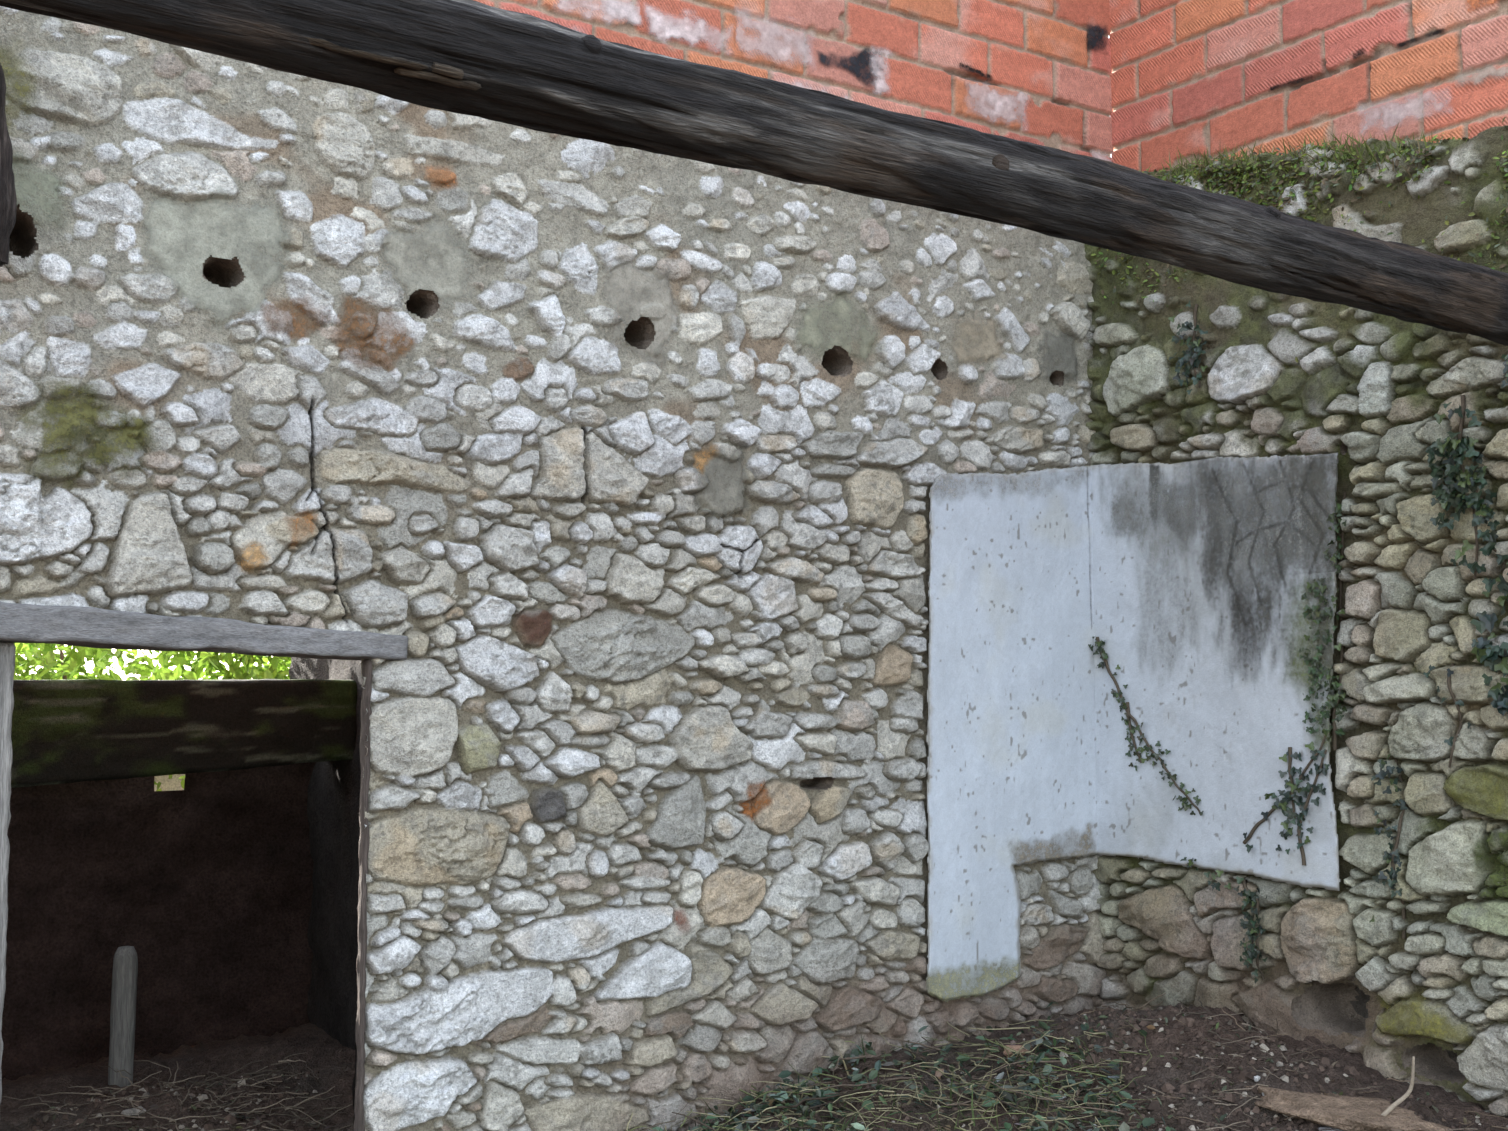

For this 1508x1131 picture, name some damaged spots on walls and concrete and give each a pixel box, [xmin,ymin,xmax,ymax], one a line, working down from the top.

crack [306,400,348,623]
damp [1113,454,1338,667]